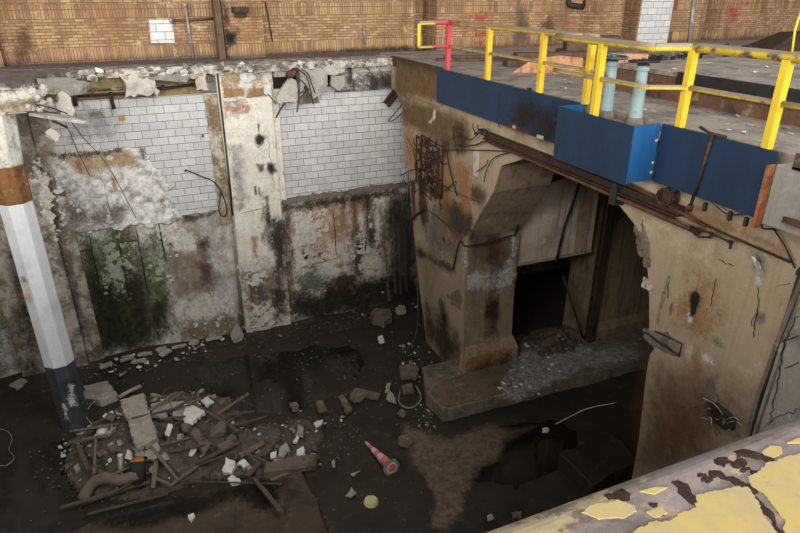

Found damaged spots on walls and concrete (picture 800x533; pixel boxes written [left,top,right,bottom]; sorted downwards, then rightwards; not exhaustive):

spalling [221,72,274,102]
flaking render [297,89,319,104]
spalling [335,68,391,93]
water stain [241,195,420,331]
water stain [463,233,517,292]
spalling [633,219,654,291]
water stain [87,252,165,348]
rust [684,291,705,326]
crack [751,286,764,337]
crack [765,316,799,427]
spalling [695,393,743,438]
peeling [582,438,800,533]